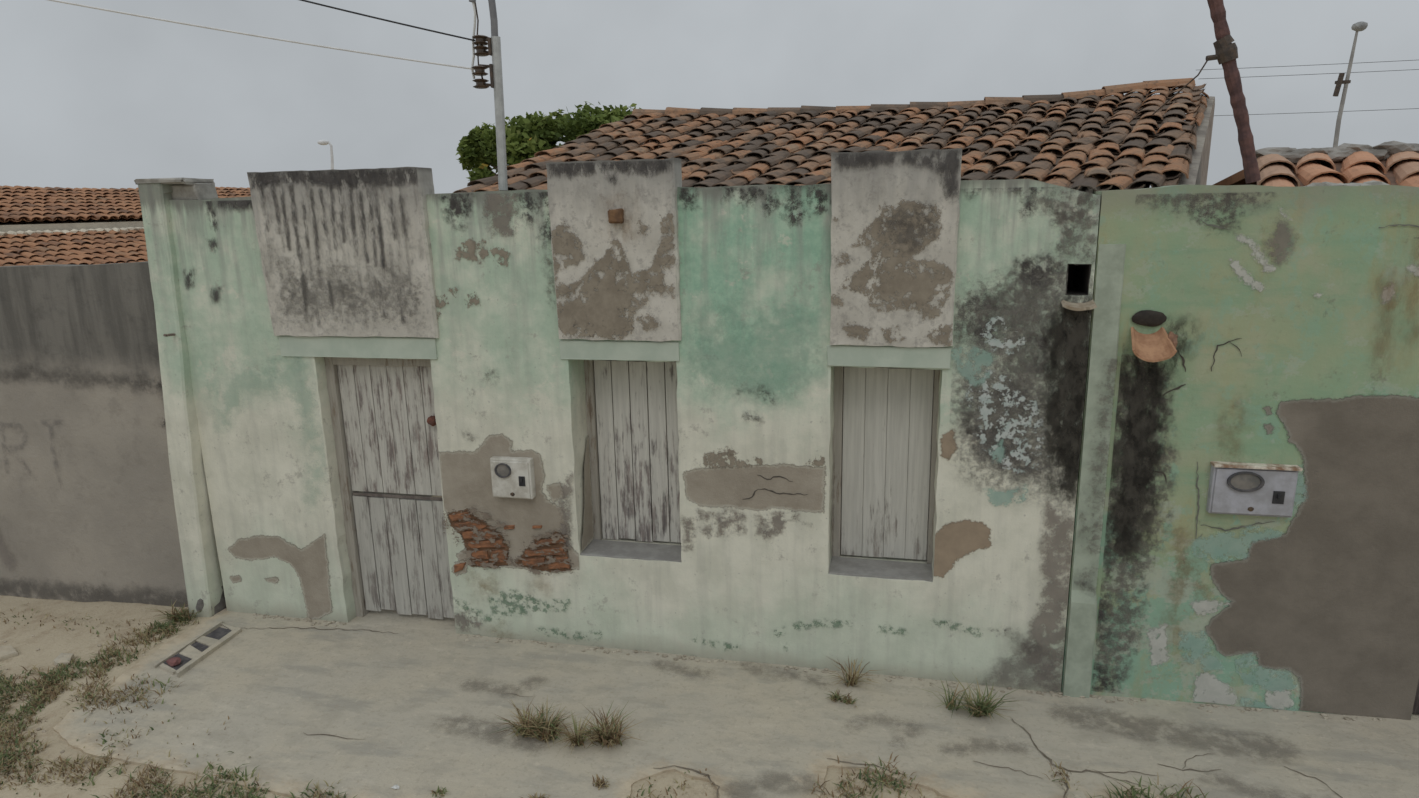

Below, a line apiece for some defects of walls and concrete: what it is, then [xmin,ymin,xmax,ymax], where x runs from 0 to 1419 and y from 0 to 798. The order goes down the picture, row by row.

leakage [206,168,418,267]
peeling [547,213,676,340]
peeling [439,433,594,576]
peeling [703,449,763,469]
peeling [808,457,835,555]
leakage [831,150,1175,693]
peeling [1192,526,1282,561]
peeling [1147,600,1297,711]